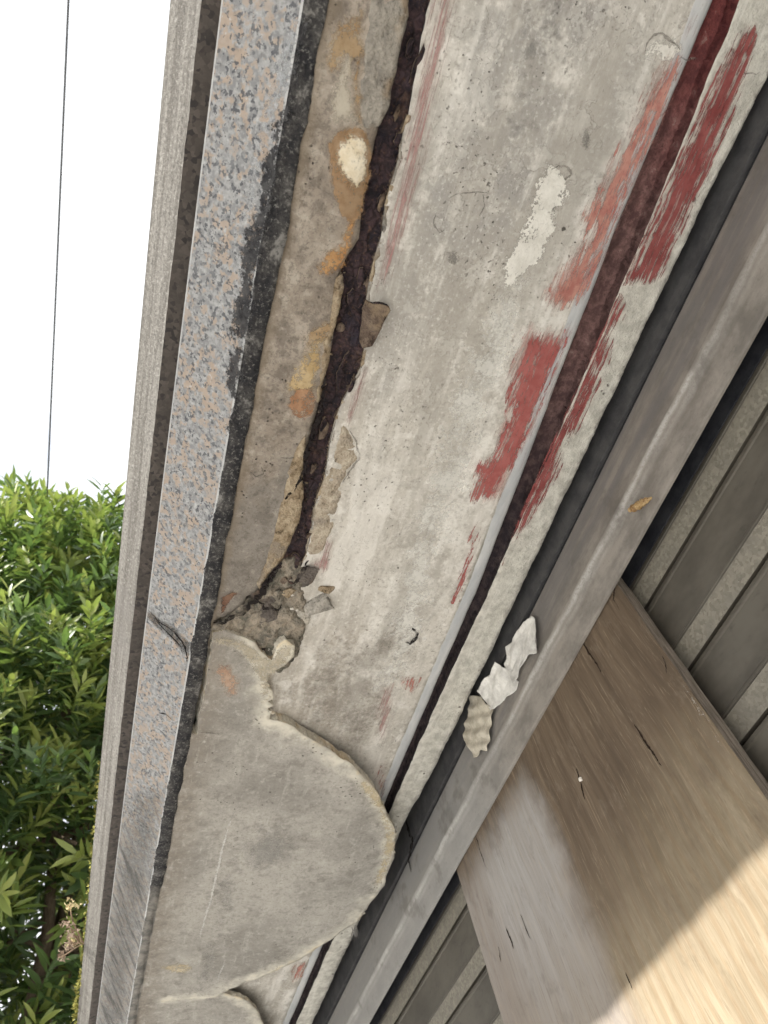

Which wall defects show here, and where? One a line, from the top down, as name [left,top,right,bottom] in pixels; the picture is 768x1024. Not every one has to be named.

spalling [208,0,447,673]
peeling [511,25,757,539]
crack [285,375,327,502]
crack [155,617,188,661]
crack [213,560,309,625]